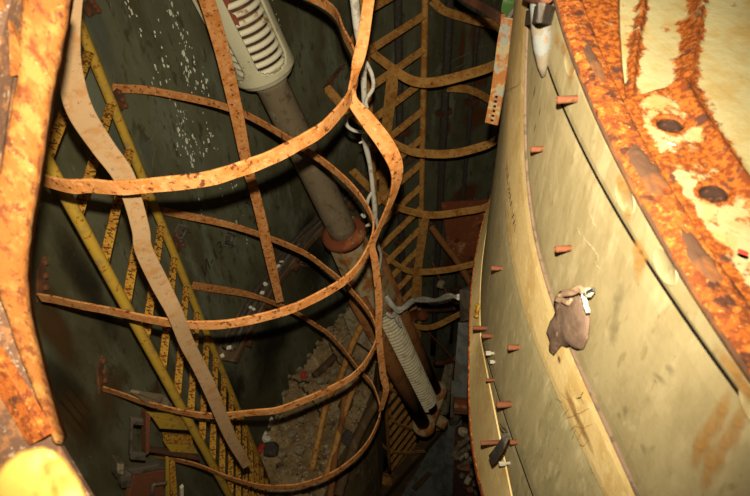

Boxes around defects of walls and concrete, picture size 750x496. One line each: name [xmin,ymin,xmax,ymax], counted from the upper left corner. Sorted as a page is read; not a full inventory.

corrosion [582,40,606,82]
damp [112,126,122,148]
corrosion [627,144,668,197]
corrosion [680,227,724,283]